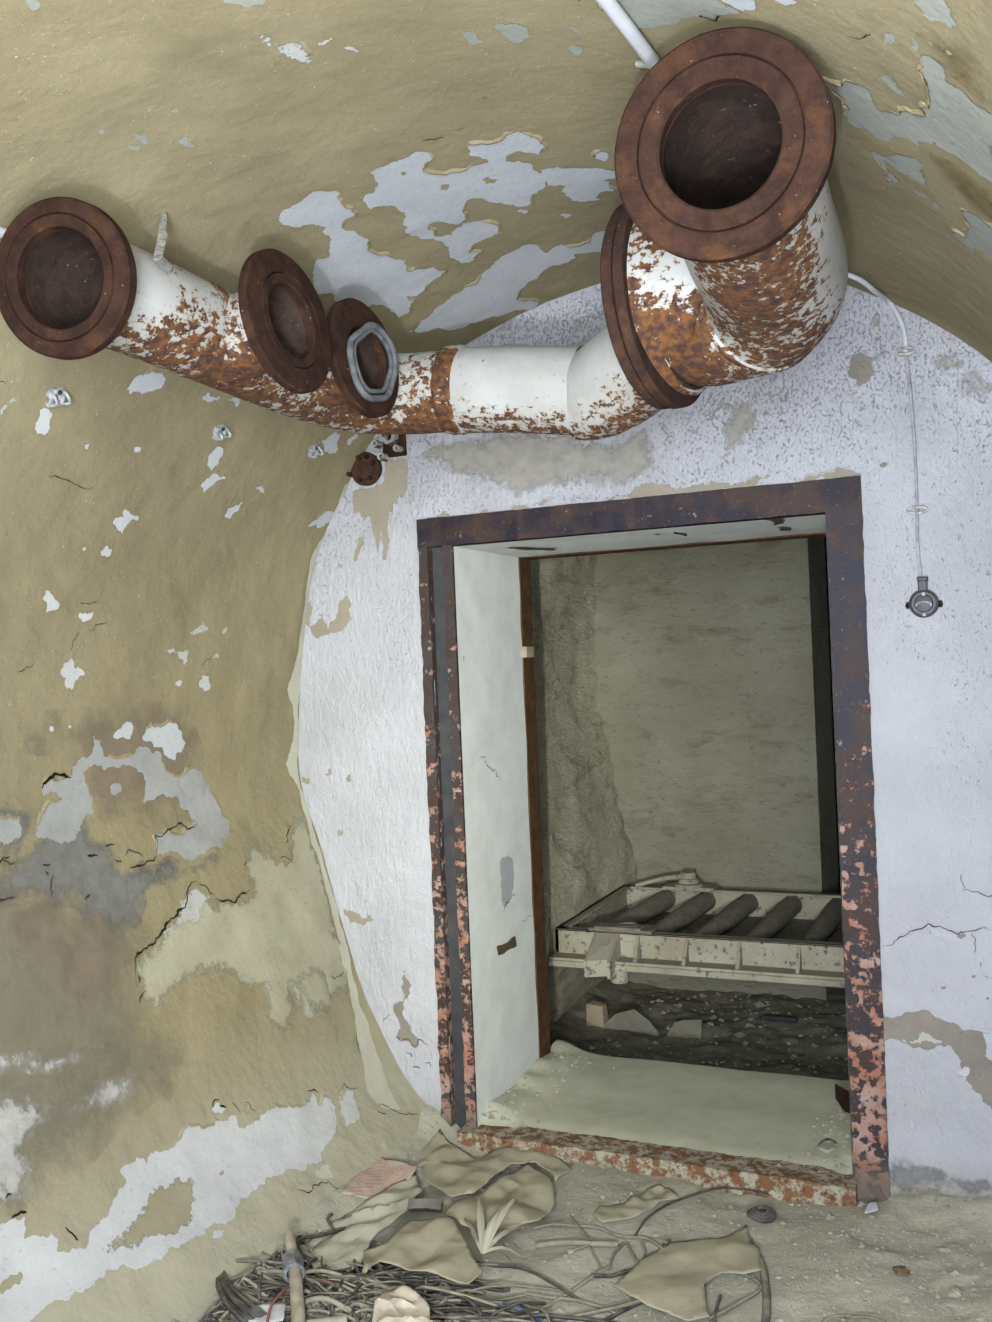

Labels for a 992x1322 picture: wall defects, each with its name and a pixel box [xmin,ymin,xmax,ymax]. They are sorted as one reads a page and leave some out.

peeling [901,0,956,28]
peeling [822,33,992,209]
peeling [279,131,618,333]
peeling [201,446,225,493]
crack [42,772,71,790]
crack [0,856,54,897]
crack [88,822,197,868]
peeling [0,458,408,1322]
crack [135,862,250,1003]
crack [880,924,990,979]
spalling [392,971,420,1048]
spalling [883,1006,992,1109]